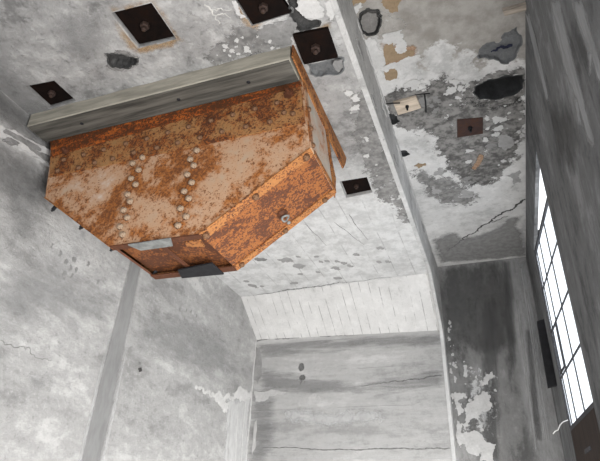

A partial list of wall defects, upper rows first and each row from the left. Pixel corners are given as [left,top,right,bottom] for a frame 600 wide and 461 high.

peeling [203,0,334,65]
spalling [104,50,139,71]
spalling [307,56,345,77]
peeling [344,3,526,253]
crack [448,199,526,251]
leakage [434,217,525,262]
peeling [277,256,306,284]
peeling [314,256,354,280]
crack [1,340,51,361]
crack [365,375,442,386]
peeling [448,320,500,461]